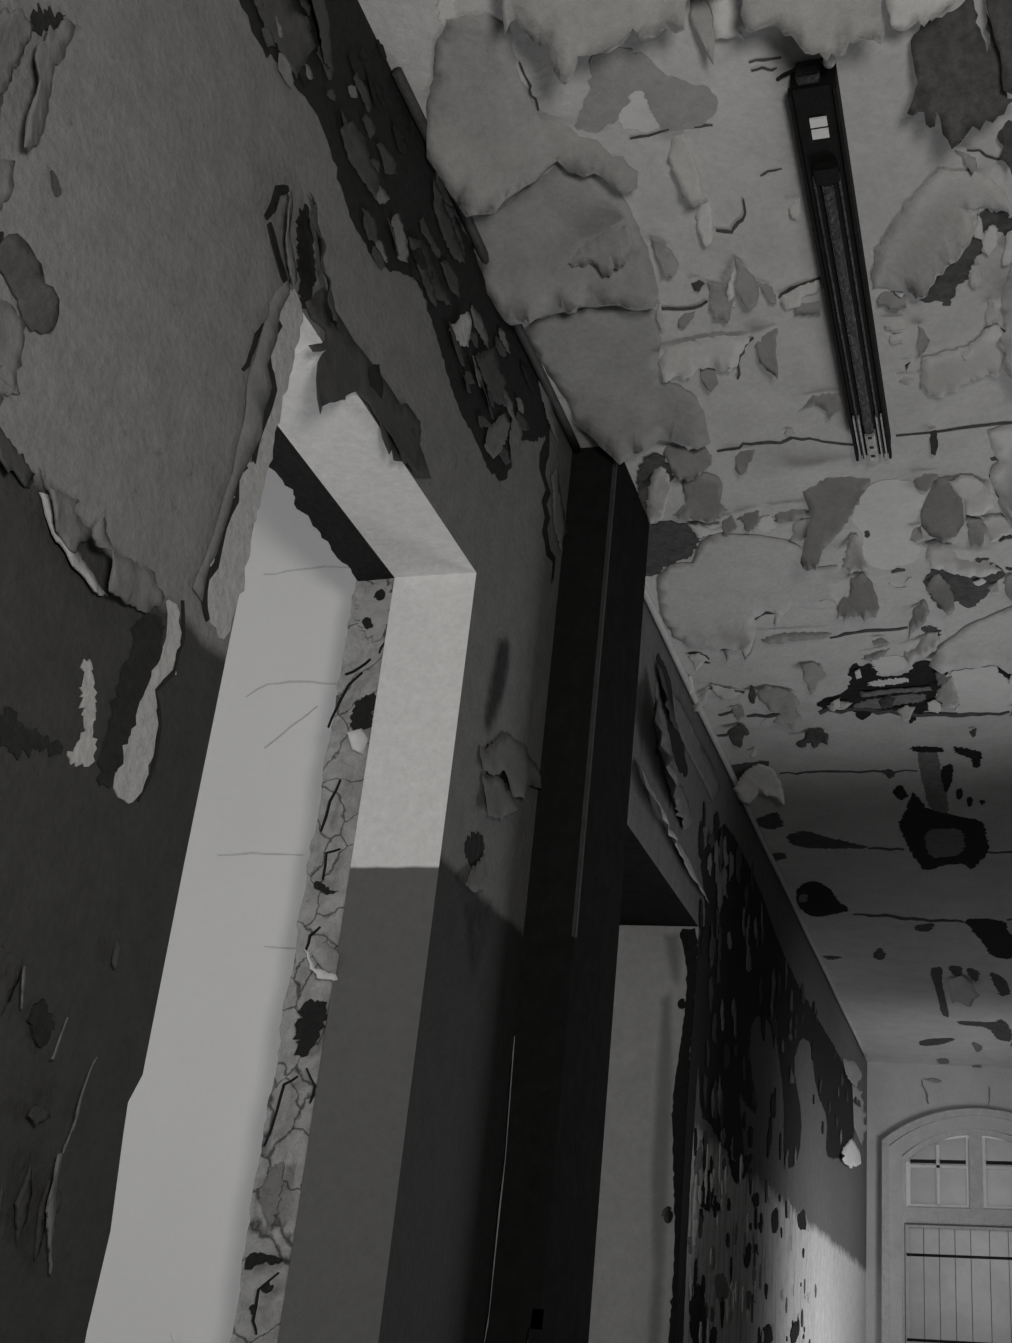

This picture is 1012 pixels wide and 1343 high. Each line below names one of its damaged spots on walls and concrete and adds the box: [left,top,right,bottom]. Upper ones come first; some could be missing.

peeling [0,3,76,152]
peeling [0,158,15,211]
peeling [50,170,62,197]
spalling [0,184,431,804]
crack [245,680,336,748]
peeling [239,0,1012,1343]
crack [217,850,303,858]
peeling [0,945,69,1059]
peeling [46,1057,98,1278]